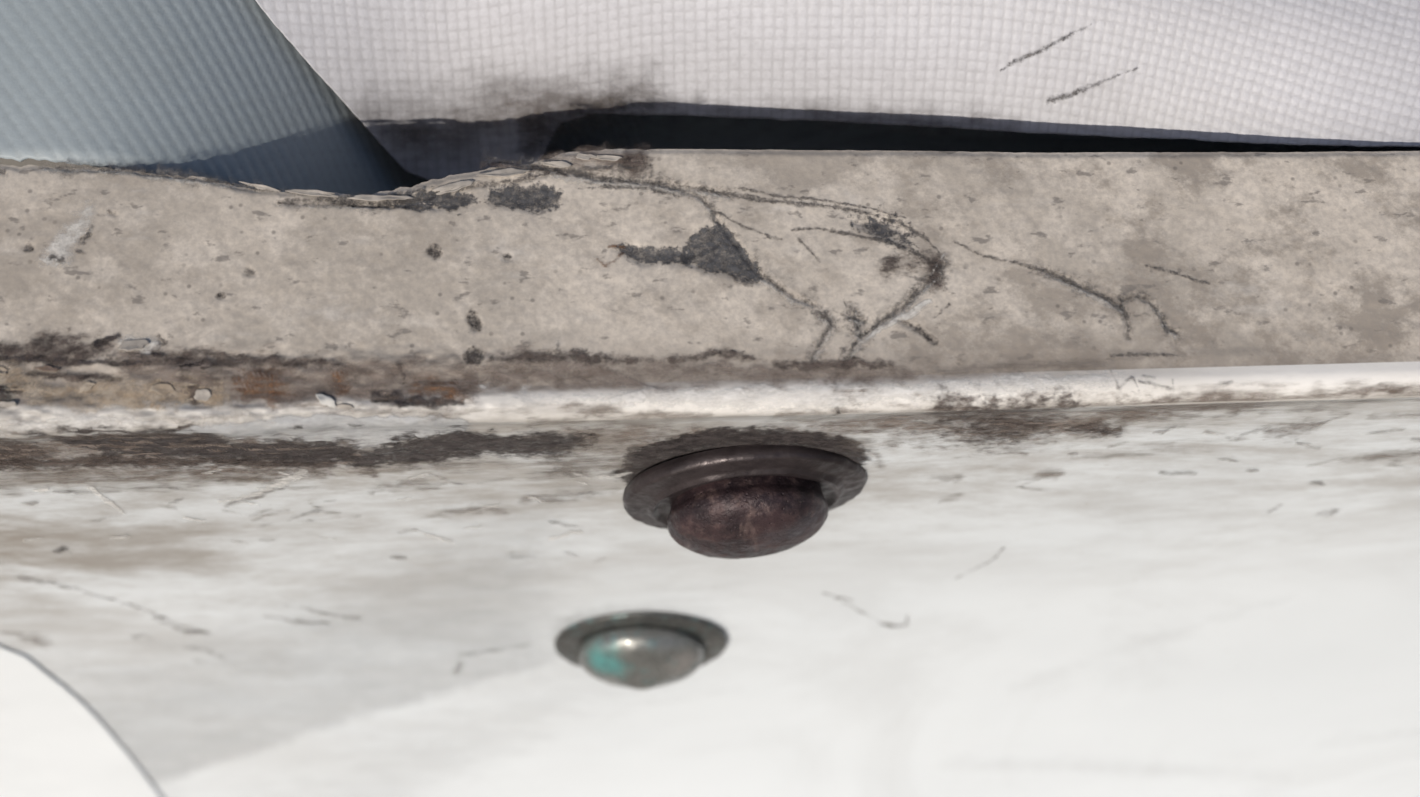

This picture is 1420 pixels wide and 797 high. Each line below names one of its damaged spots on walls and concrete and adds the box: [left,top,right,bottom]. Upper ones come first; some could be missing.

spalling [239,146,651,216]
spalling [604,225,762,285]
crack [488,158,1207,414]
water stain [0,328,202,367]
water stain [0,425,702,489]